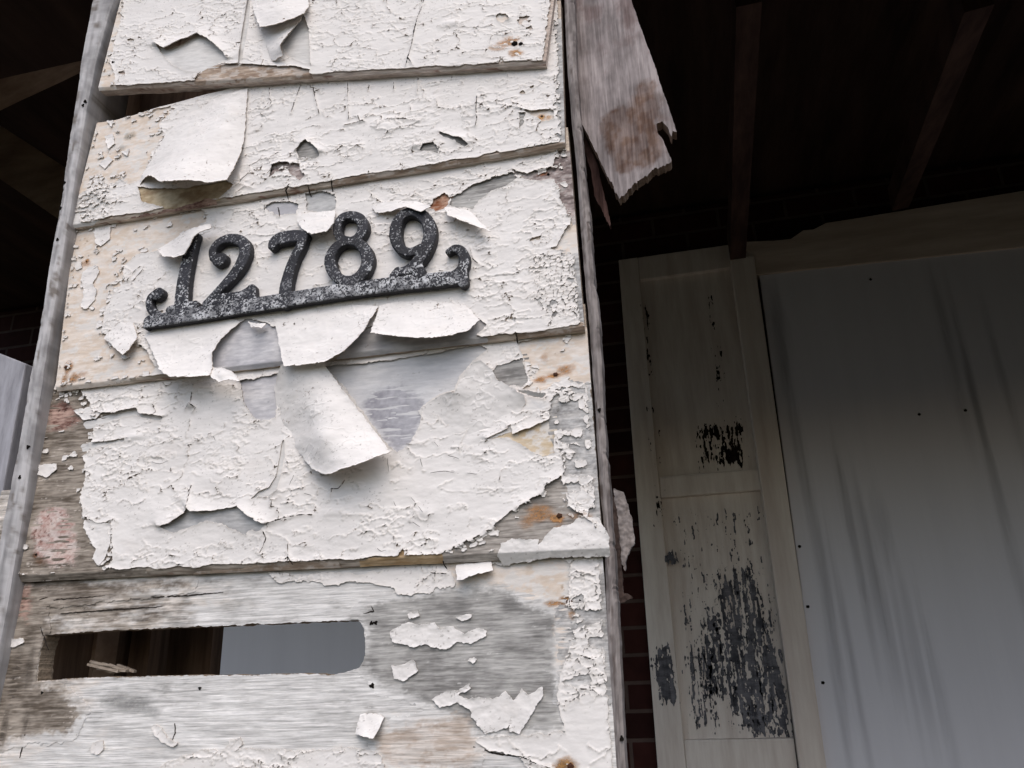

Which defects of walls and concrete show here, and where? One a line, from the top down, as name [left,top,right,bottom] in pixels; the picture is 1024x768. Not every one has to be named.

corrosion [500,38,523,56]
peeling [0,0,635,768]
corrosion [531,507,563,522]